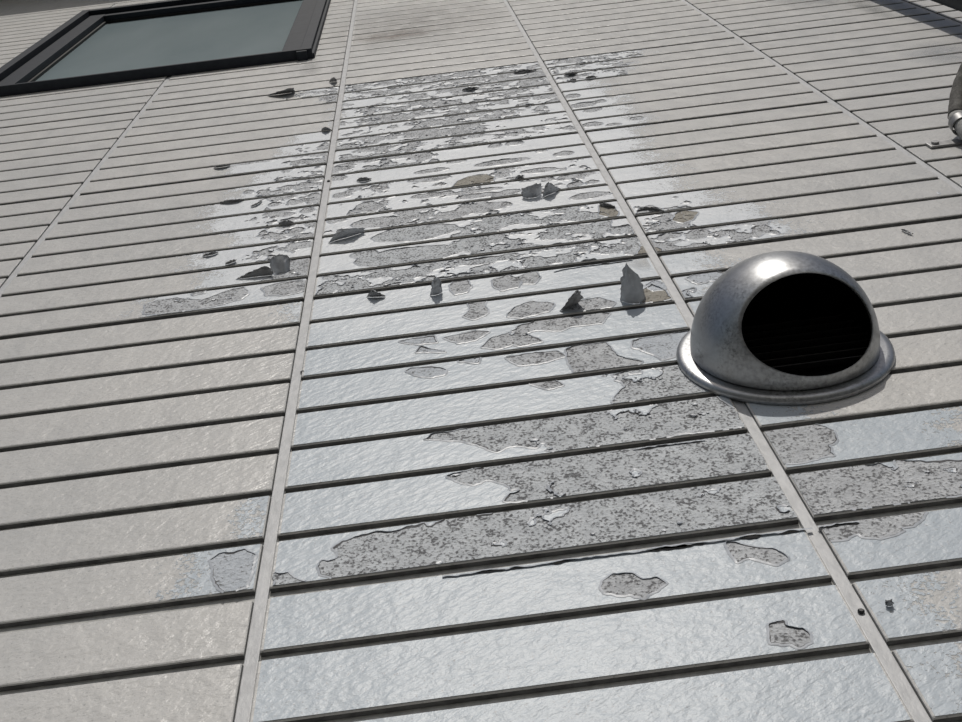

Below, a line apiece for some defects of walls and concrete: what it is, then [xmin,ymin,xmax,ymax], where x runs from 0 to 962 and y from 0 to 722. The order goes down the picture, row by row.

peeling [117,49,910,722]
crack [442,521,860,577]
peeling [749,403,962,638]
peeling [896,641,962,716]